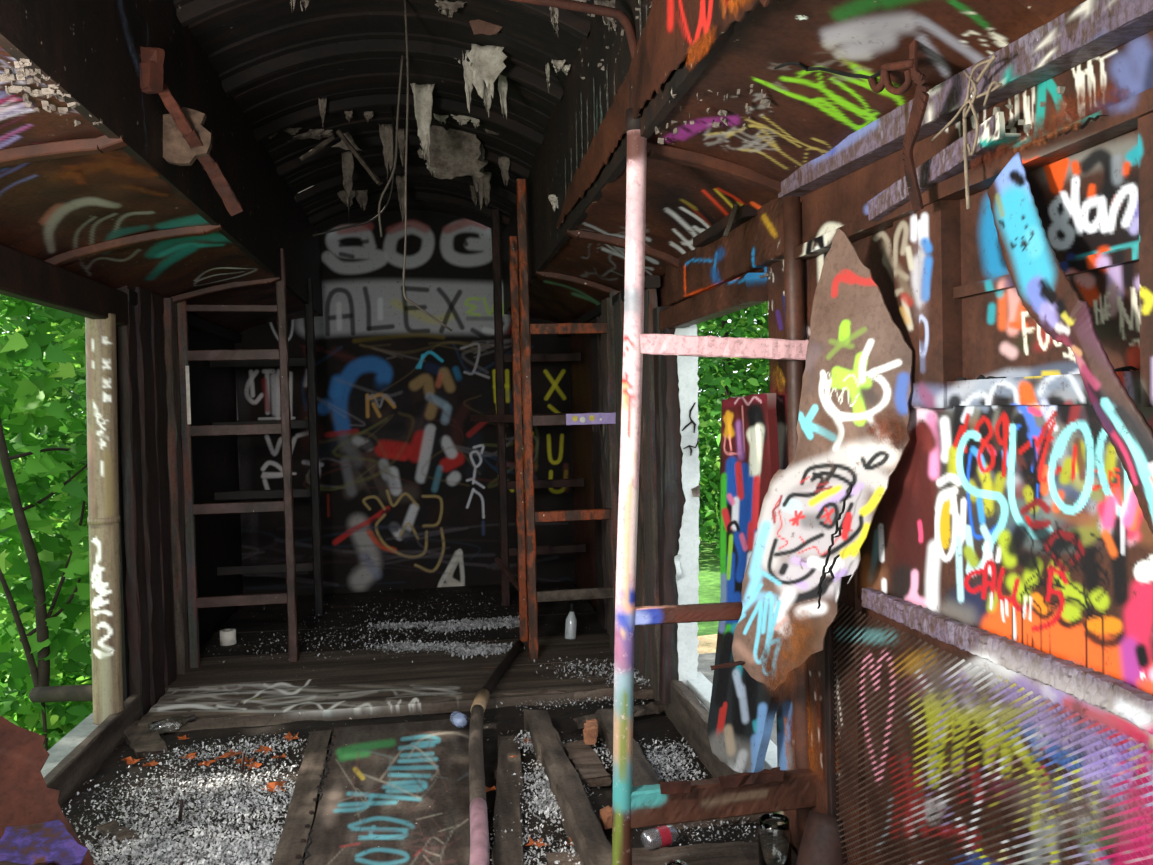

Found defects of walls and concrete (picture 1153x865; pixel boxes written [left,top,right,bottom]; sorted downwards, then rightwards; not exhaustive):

peeling [289,0,309,12]
peeling [435,0,467,18]
peeling [549,7,559,34]
peeling [574,0,624,36]
peeling [545,48,585,91]
peeling [268,98,327,139]
peeling [344,44,510,222]
peeling [337,151,368,216]